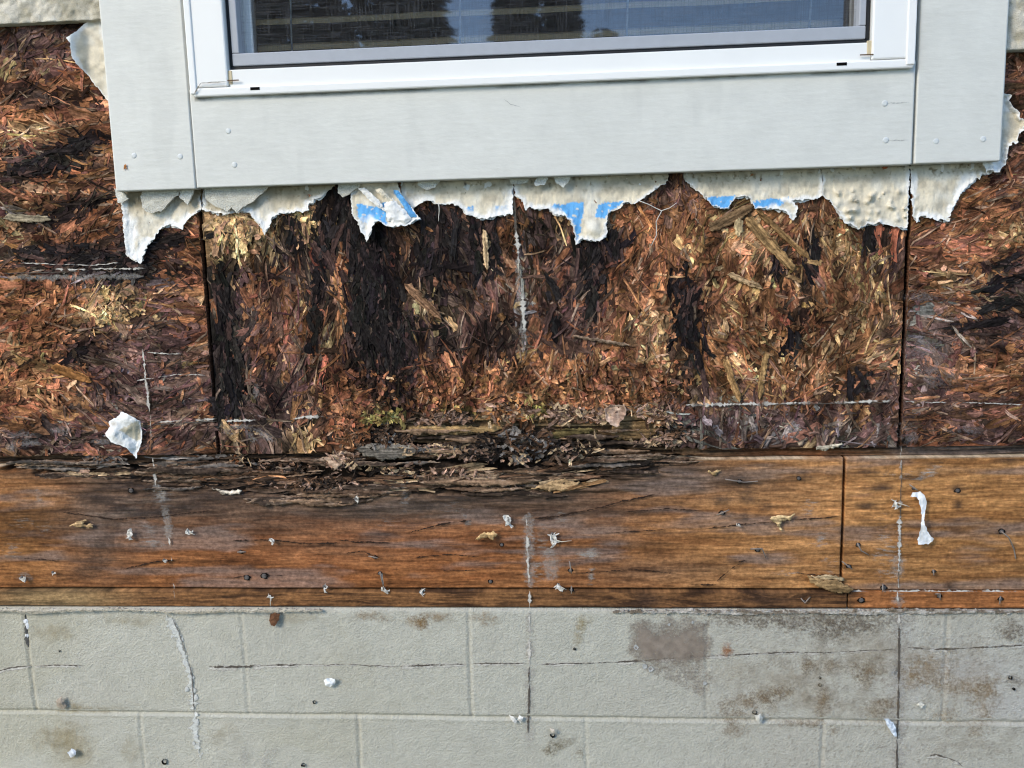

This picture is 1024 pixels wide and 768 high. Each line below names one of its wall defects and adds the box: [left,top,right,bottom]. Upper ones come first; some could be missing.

flaking render [114,186,269,213]
flaking render [338,183,361,198]
flaking render [418,181,440,190]
flaking render [509,176,571,188]
water stain [280,189,415,413]
water stain [413,202,504,289]
water stain [570,226,637,324]
water stain [666,257,717,397]
water stain [768,244,789,288]
water stain [778,308,803,367]
water stain [800,227,821,287]
water stain [861,224,880,258]